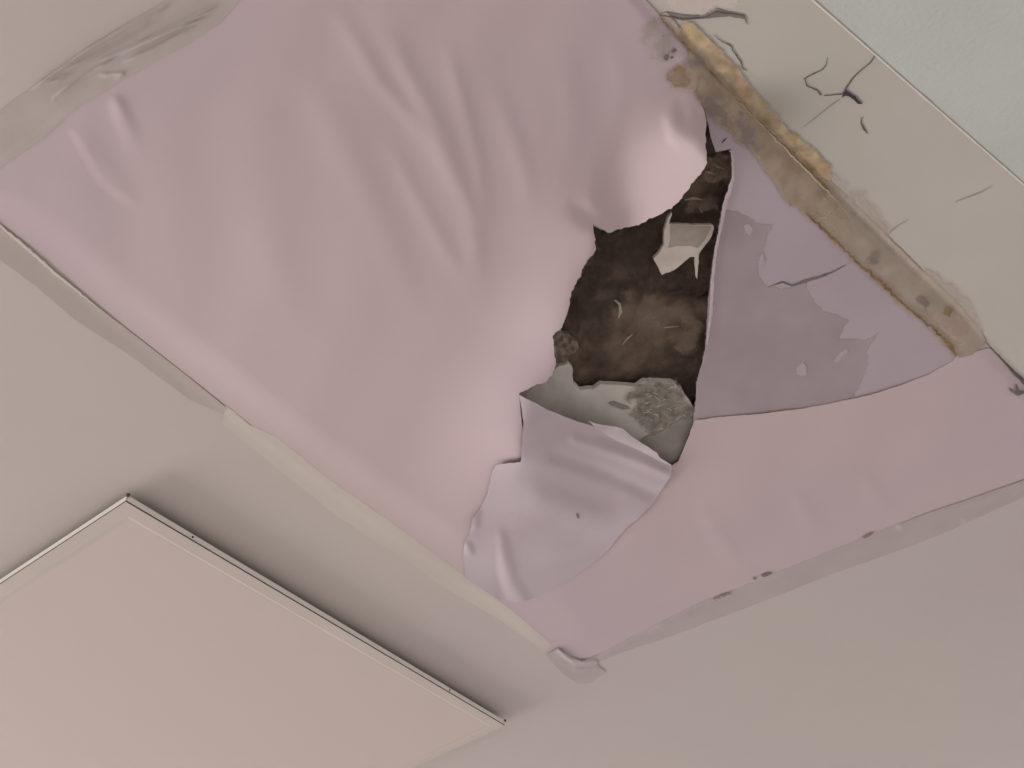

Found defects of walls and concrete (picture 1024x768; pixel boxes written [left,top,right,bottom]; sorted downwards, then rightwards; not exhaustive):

water stain [644,0,848,234]
crack [804,56,875,134]
peeling [527,105,957,465]